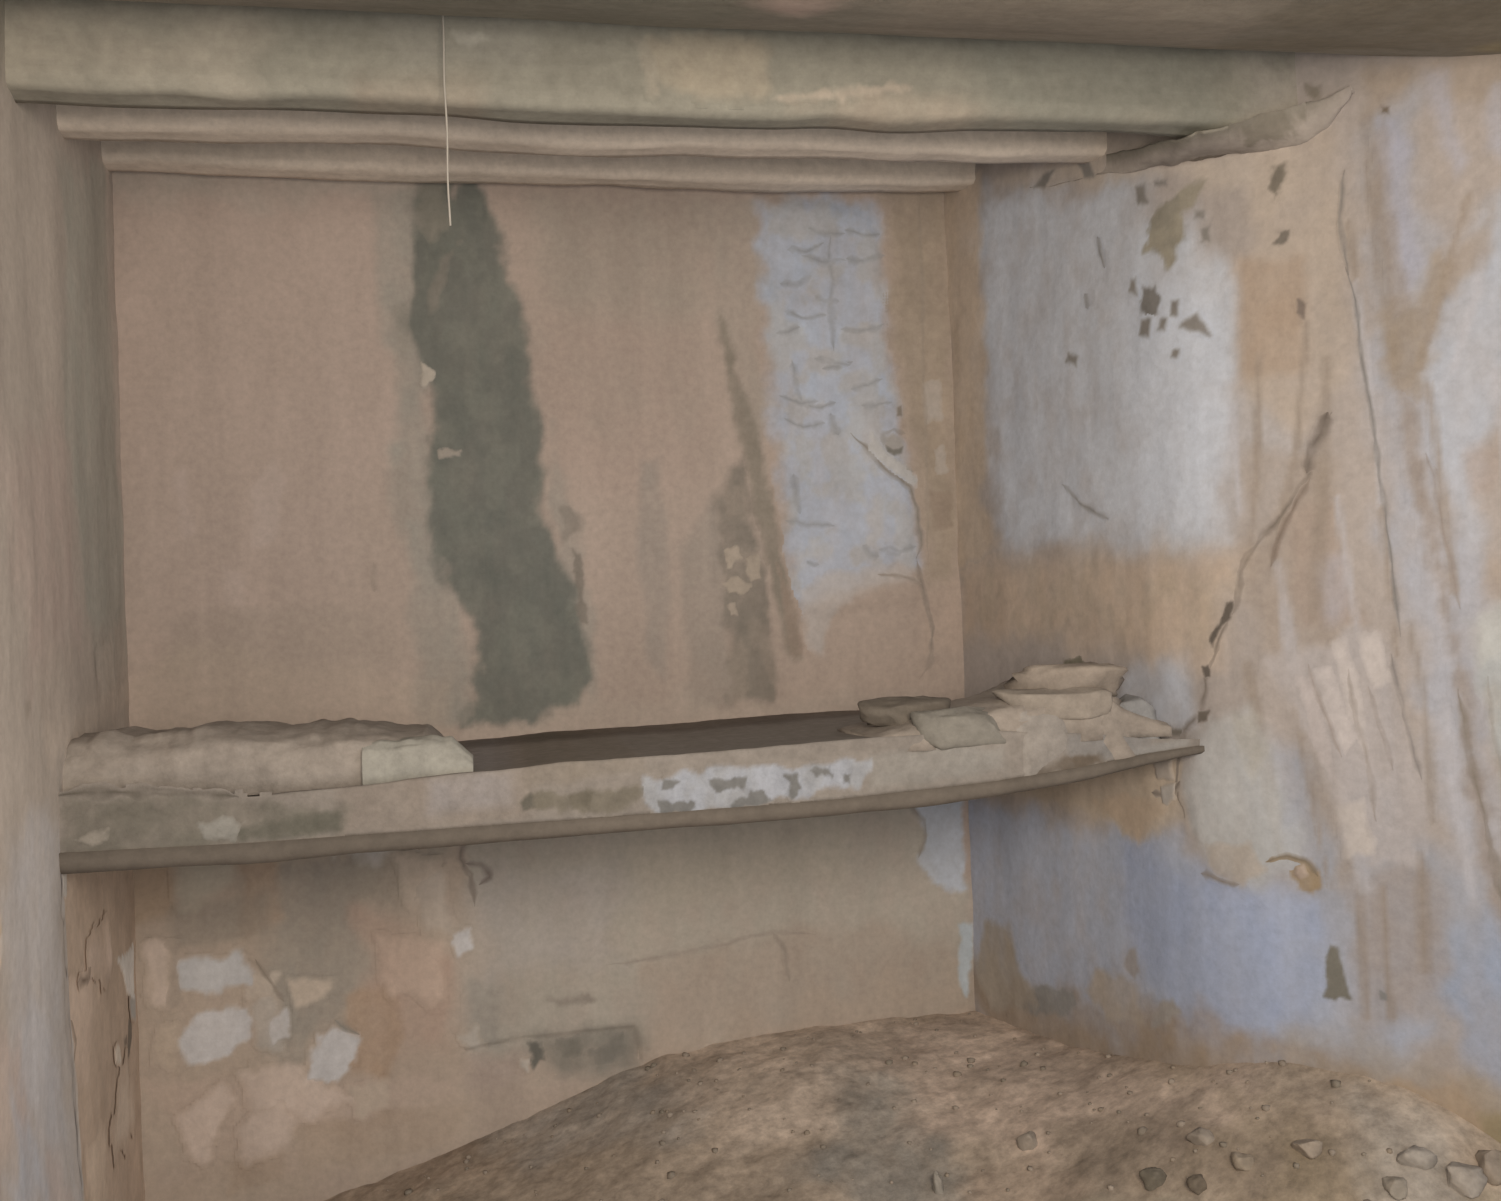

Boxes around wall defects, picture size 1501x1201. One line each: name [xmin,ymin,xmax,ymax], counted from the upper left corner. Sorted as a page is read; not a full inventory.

peeling [1127,174,1214,362]
damp [376,183,598,734]
peeling [745,192,924,663]
peeling [1063,349,1081,370]
crack [1152,169,1401,818]
peeling [61,864,395,1201]
peeling [329,850,476,1010]
crack [455,845,495,907]
peeling [640,755,877,814]
peeling [908,801,970,896]
spalling [1321,941,1356,1004]